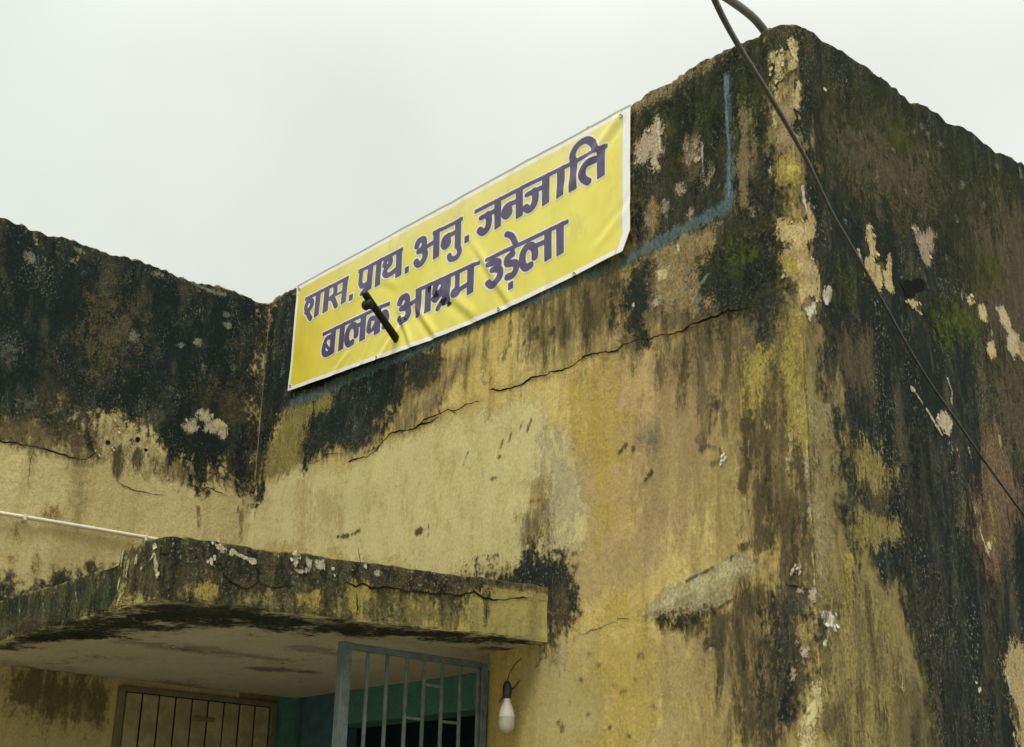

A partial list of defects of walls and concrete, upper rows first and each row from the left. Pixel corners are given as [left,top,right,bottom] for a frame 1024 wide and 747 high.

peeling [633,57,716,174]
peeling [857,223,944,343]
peeling [960,292,1024,362]
crack [0,440,98,478]
peeling [181,408,229,440]
leakage [0,218,582,666]
crack [307,307,751,467]
leakage [608,25,1024,747]
peeling [207,538,257,566]
crack [216,559,295,590]